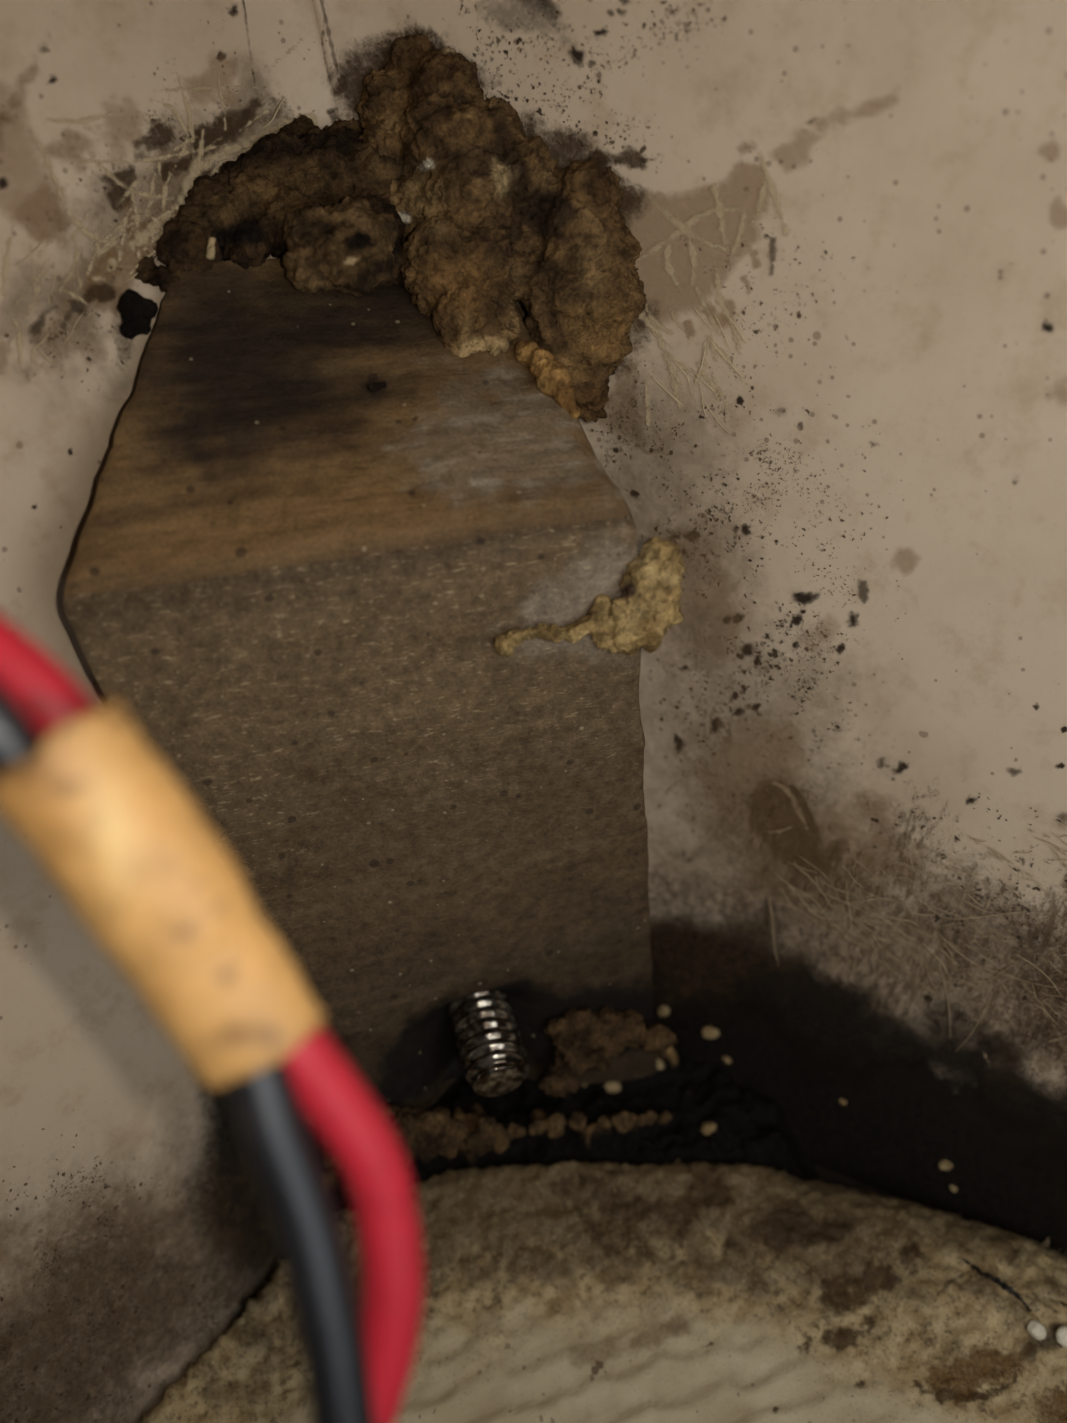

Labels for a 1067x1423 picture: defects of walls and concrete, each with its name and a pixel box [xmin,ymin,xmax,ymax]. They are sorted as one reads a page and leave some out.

peeling [1,52,317,391]